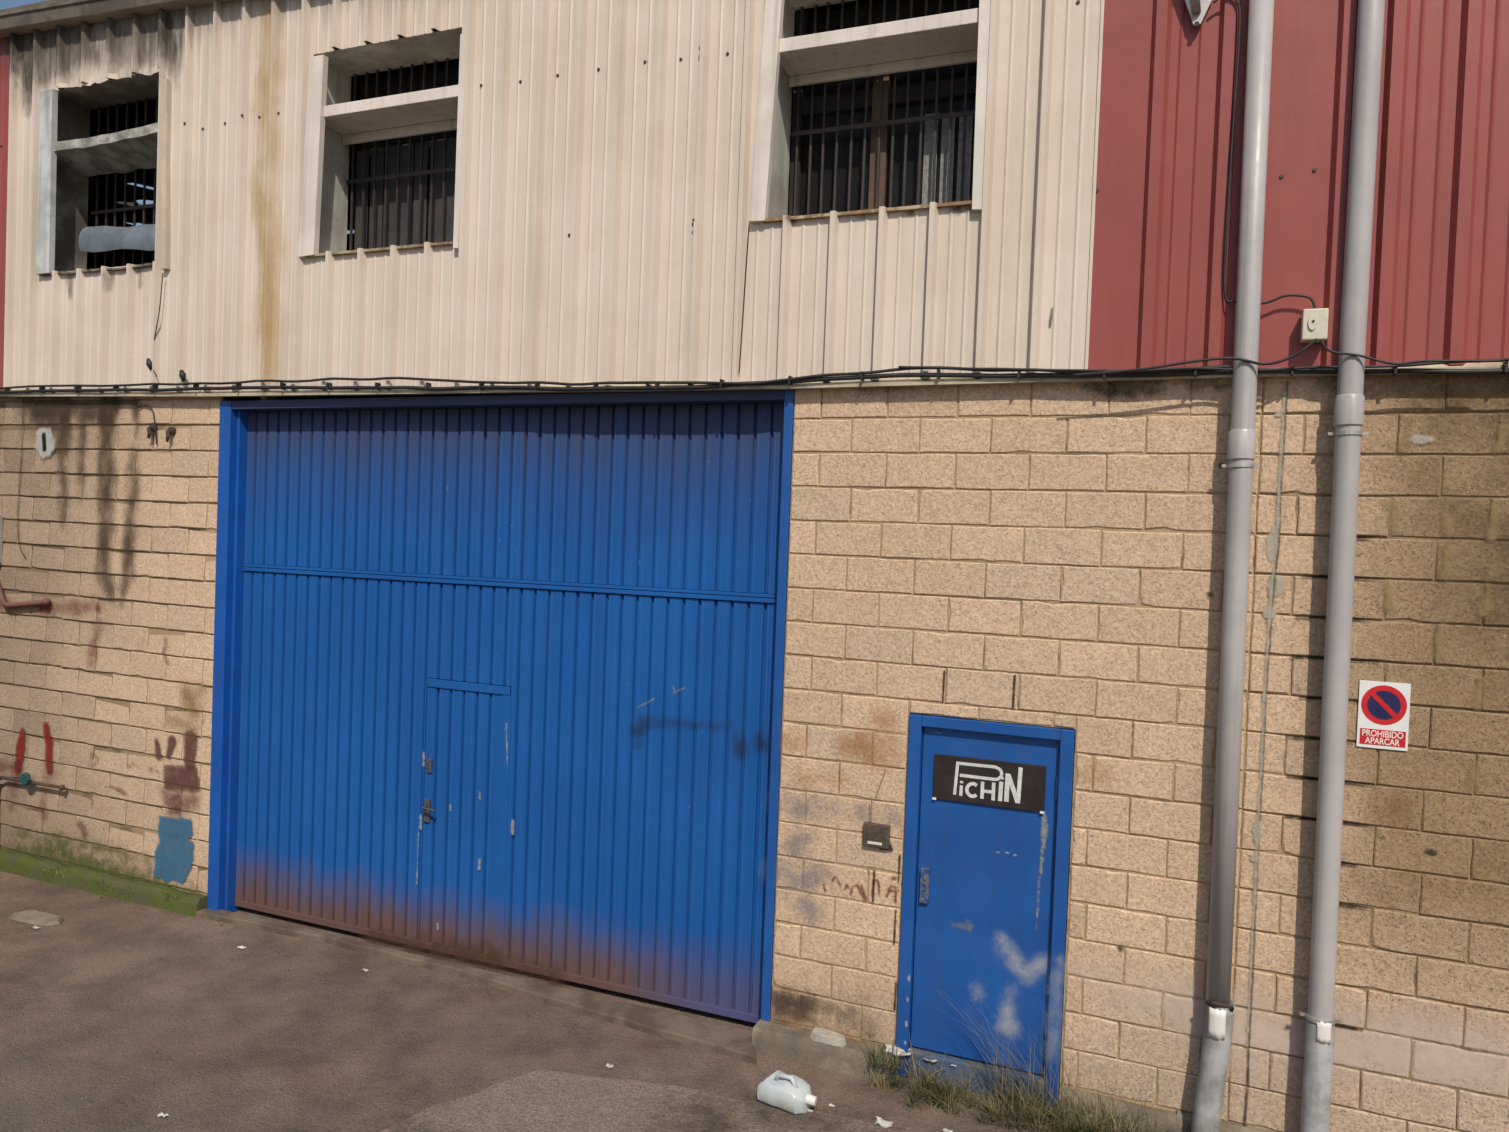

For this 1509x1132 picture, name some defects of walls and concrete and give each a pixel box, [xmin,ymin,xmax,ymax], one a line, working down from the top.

damp [9,14,176,101]
damp [27,397,138,594]